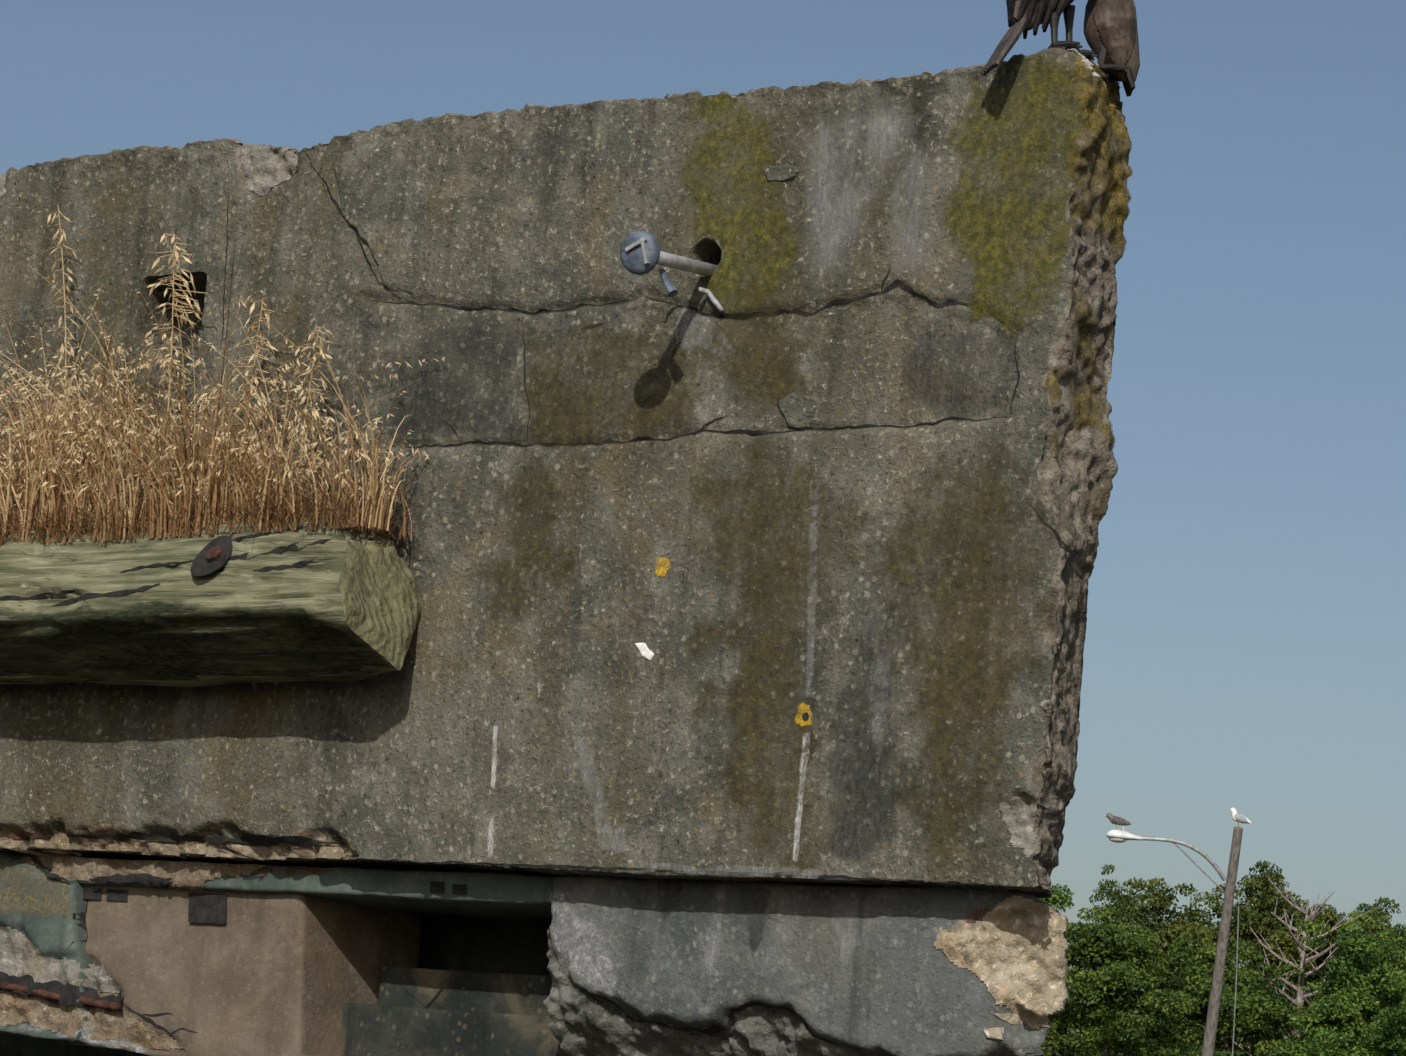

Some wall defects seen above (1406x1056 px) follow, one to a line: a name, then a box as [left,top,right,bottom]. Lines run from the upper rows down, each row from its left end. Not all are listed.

spalling [0,927,182,1053]
spalling [543,891,878,1056]
spalling [934,895,1068,1056]